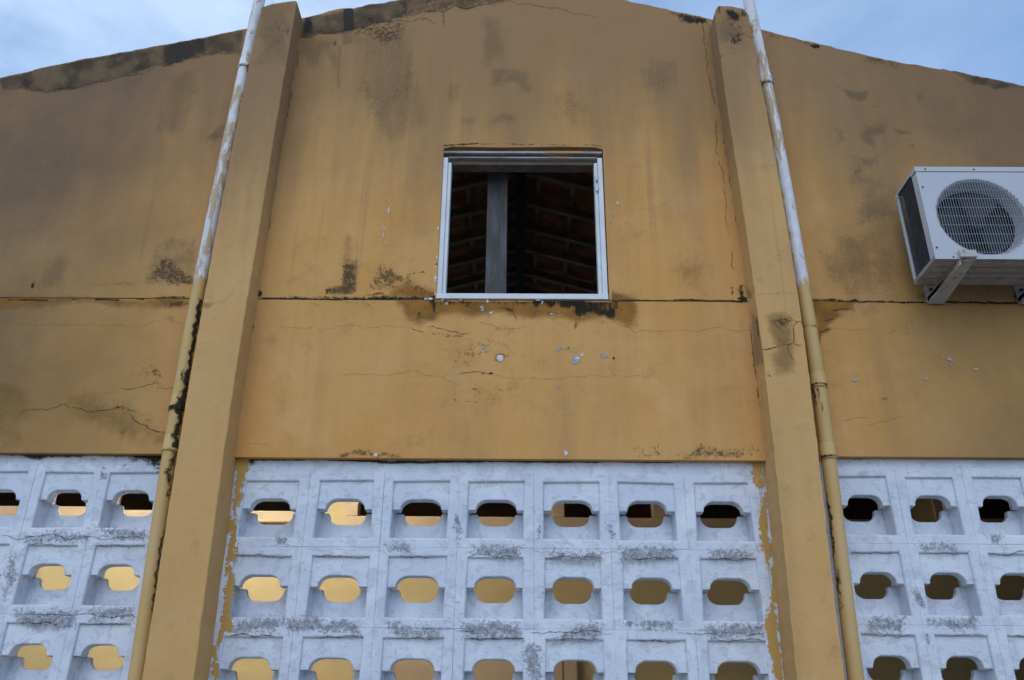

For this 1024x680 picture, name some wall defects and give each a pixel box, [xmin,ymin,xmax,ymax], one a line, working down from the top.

water stain [1,31,249,91]
water stain [258,263,747,327]
crack [19,365,171,432]
water stain [101,259,203,496]
water stain [771,316,790,368]
crack [750,318,817,398]
water stain [151,531,165,611]